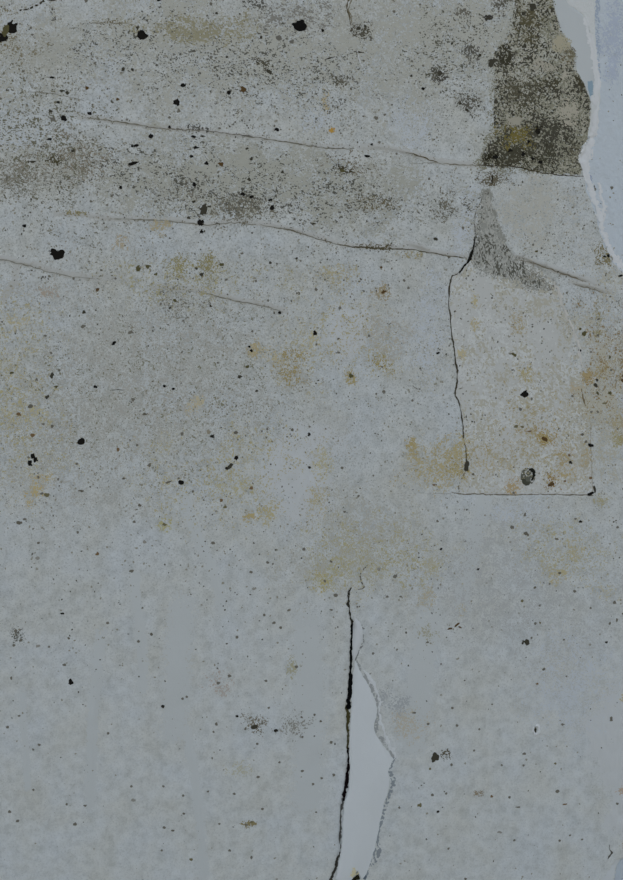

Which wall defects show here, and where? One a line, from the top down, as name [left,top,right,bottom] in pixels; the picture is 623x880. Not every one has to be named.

crack [0,259,100,280]
crack [38,92,354,149]
leakage [0,0,623,434]
crack [110,153,603,496]
peeling [530,0,623,273]
leakage [495,448,554,503]